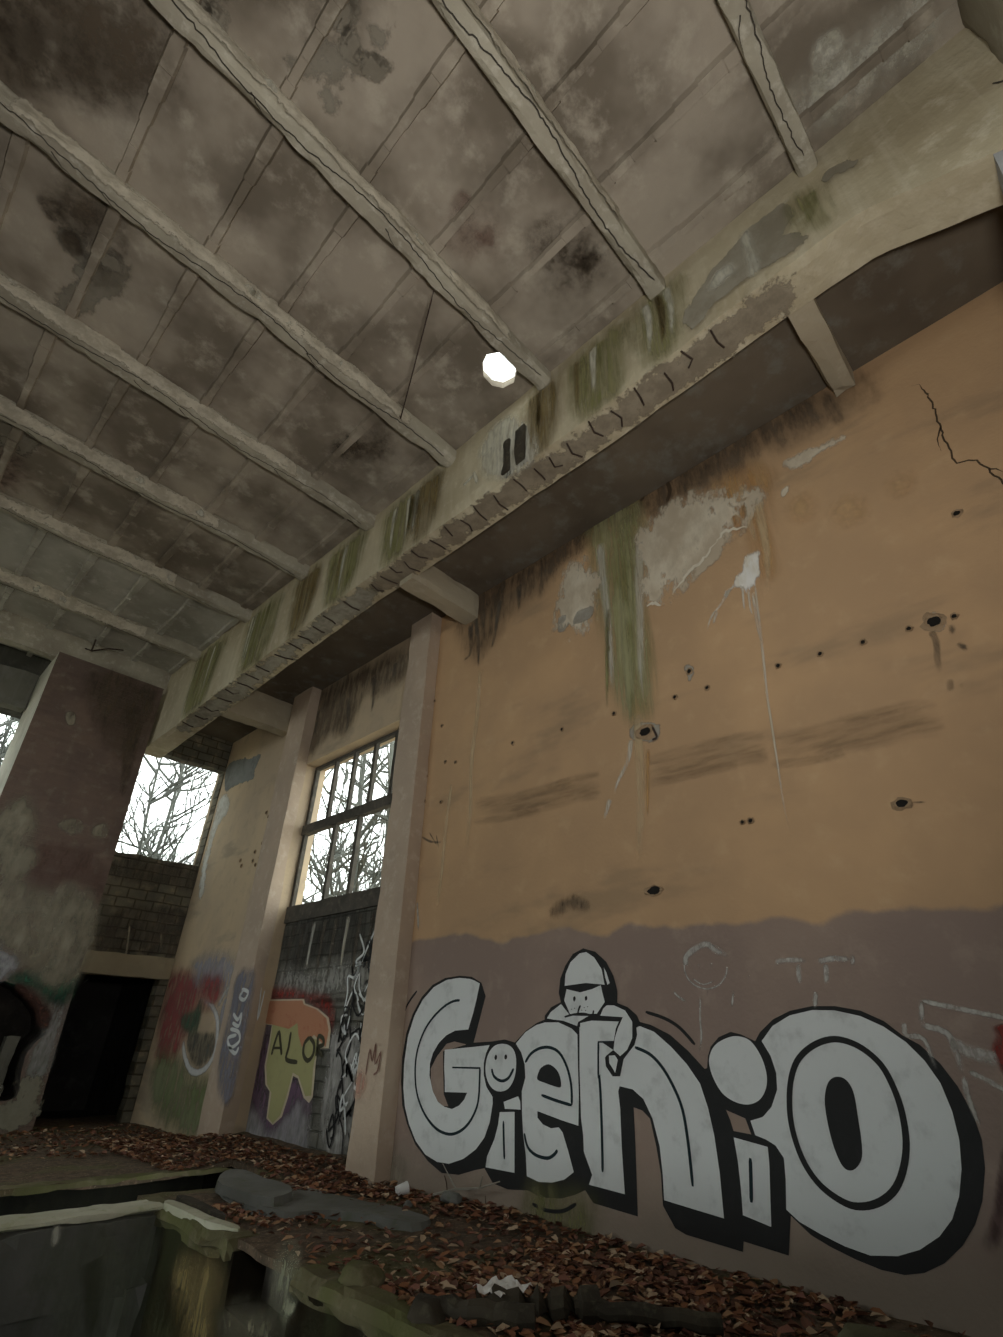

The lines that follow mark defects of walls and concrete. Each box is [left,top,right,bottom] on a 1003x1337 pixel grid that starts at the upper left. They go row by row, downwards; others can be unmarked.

leakage [575,345,601,401]
leakage [390,475,442,542]
spalling [177,203,808,732]
flaking render [783,436,846,469]
crack [919,384,1003,484]
leakage [290,541,354,632]
leakage [461,383,840,814]
leakage [309,655,406,752]
spalling [630,722,660,742]
flaking render [0,798,95,1133]